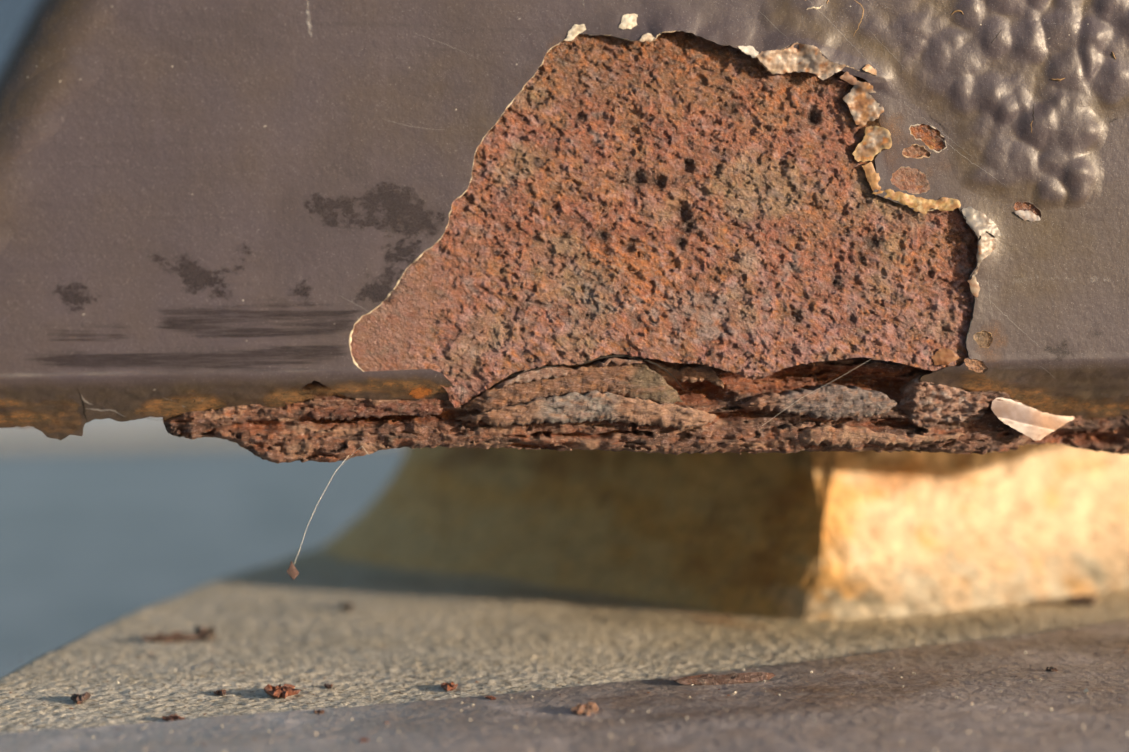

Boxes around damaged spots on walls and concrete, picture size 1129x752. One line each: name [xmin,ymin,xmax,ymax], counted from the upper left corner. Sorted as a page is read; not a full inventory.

spalling [890,124,947,194]
corrosion [265,14,1129,449]
water stain [32,182,443,368]
spalling [964,331,993,373]
corrosion [137,395,226,417]
corrosion [1066,595,1097,605]